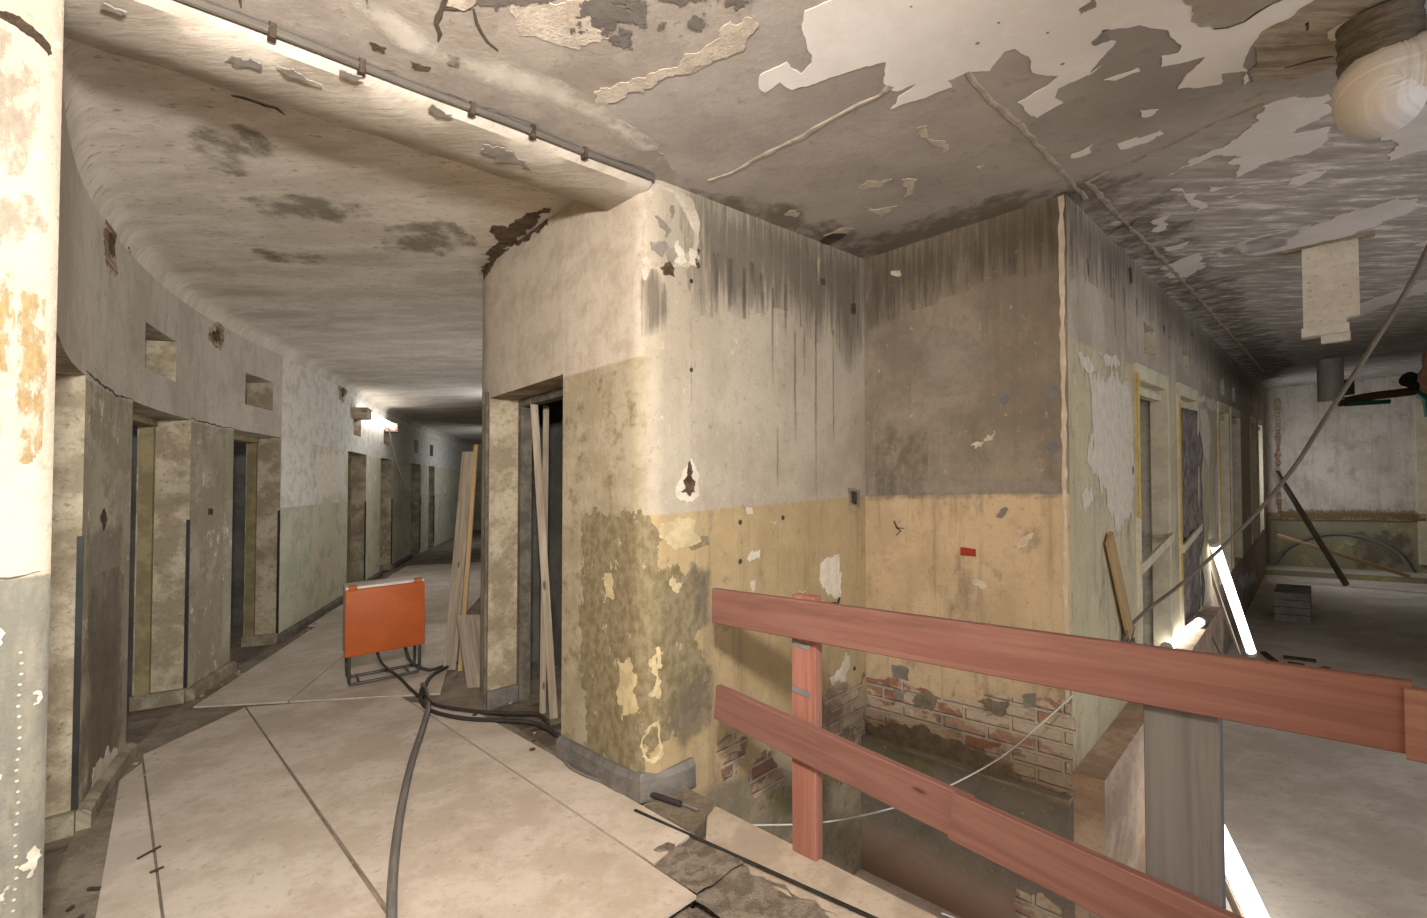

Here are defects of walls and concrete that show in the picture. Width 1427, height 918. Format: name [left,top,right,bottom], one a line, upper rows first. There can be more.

spalling [0,11,52,56]
crack [433,0,498,51]
peeling [207,0,759,281]
peeling [758,0,1391,211]
damp [0,195,43,236]
damp [276,194,342,220]
damp [400,224,474,255]
damp [648,274,663,325]
damp [705,206,859,337]
peeling [1058,195,1135,634]
peeling [579,458,711,773]
flaking render [822,652,1077,796]